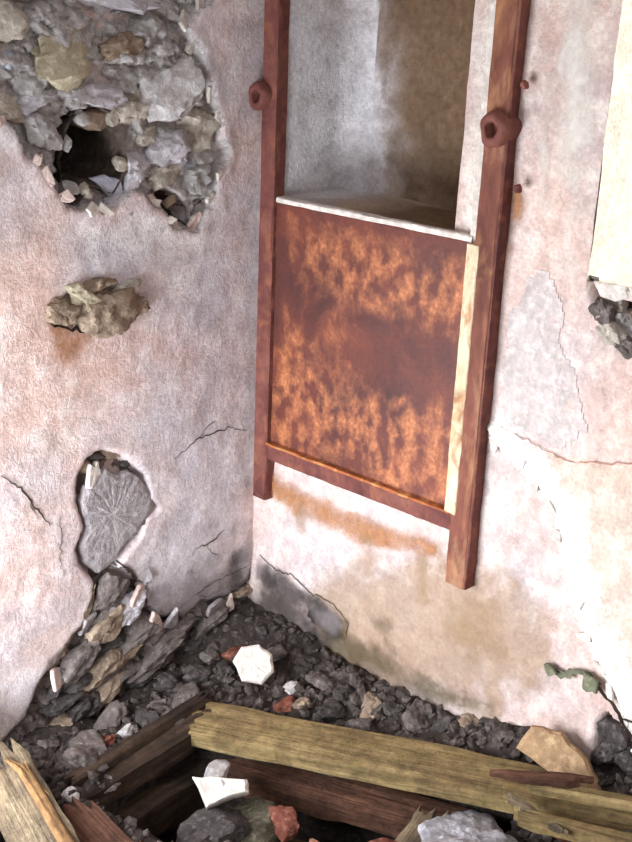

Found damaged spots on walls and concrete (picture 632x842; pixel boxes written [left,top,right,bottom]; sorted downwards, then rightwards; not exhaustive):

spalling [0,0,232,234]